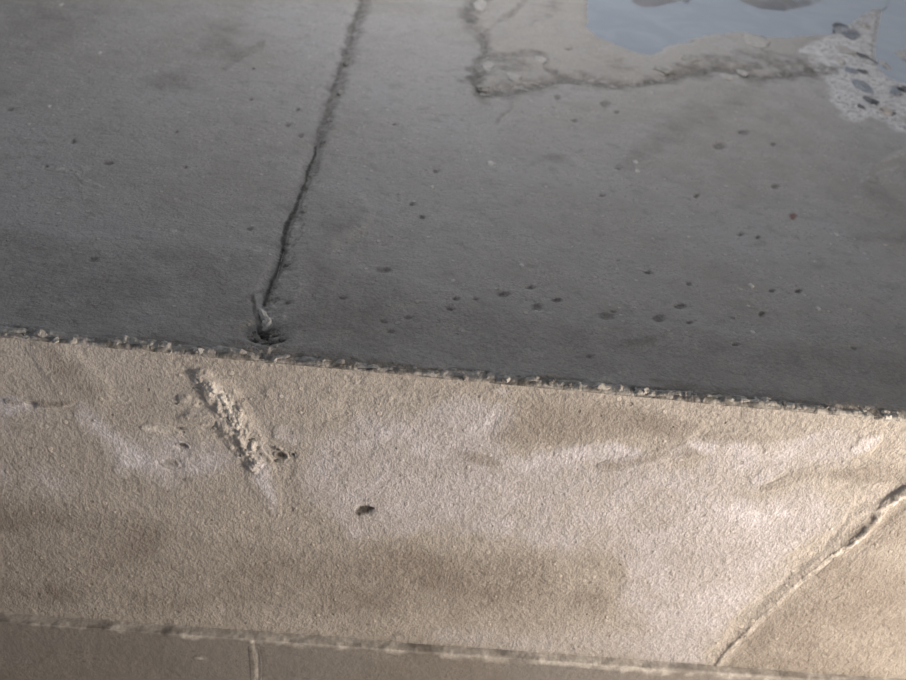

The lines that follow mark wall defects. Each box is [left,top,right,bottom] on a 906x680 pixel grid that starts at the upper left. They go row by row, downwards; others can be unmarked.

peeling [452,0,906,133]
crack [266,0,375,324]
crack [0,326,905,422]